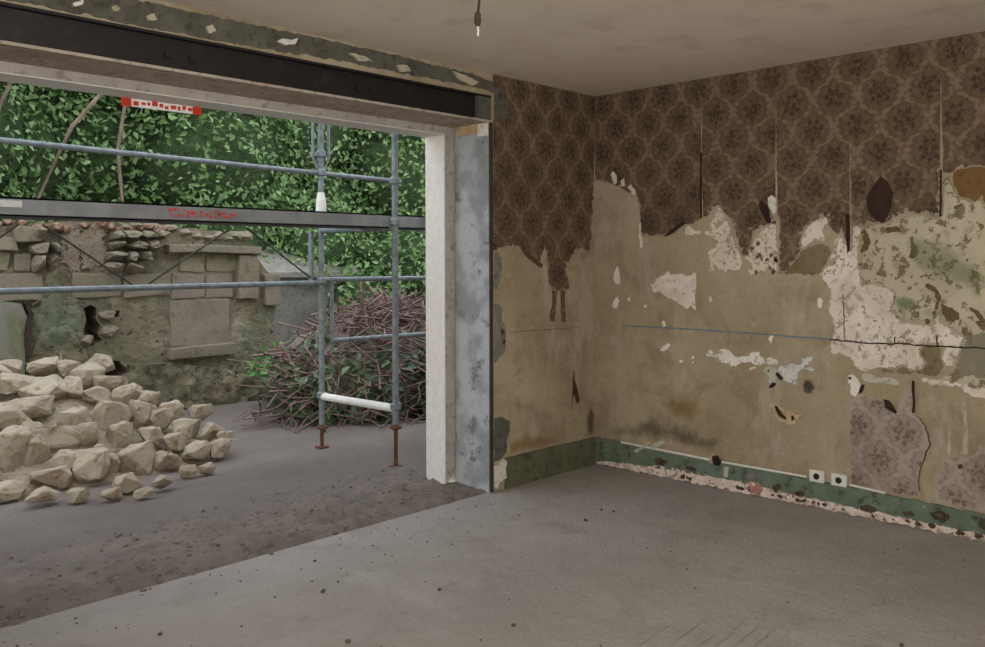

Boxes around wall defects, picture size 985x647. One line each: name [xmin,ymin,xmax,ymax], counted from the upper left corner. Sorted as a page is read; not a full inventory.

peeling [611,171,636,195]
peeling [651,271,697,310]
peeling [681,166,985,399]
spalling [769,403,804,425]
spalling [596,441,985,541]